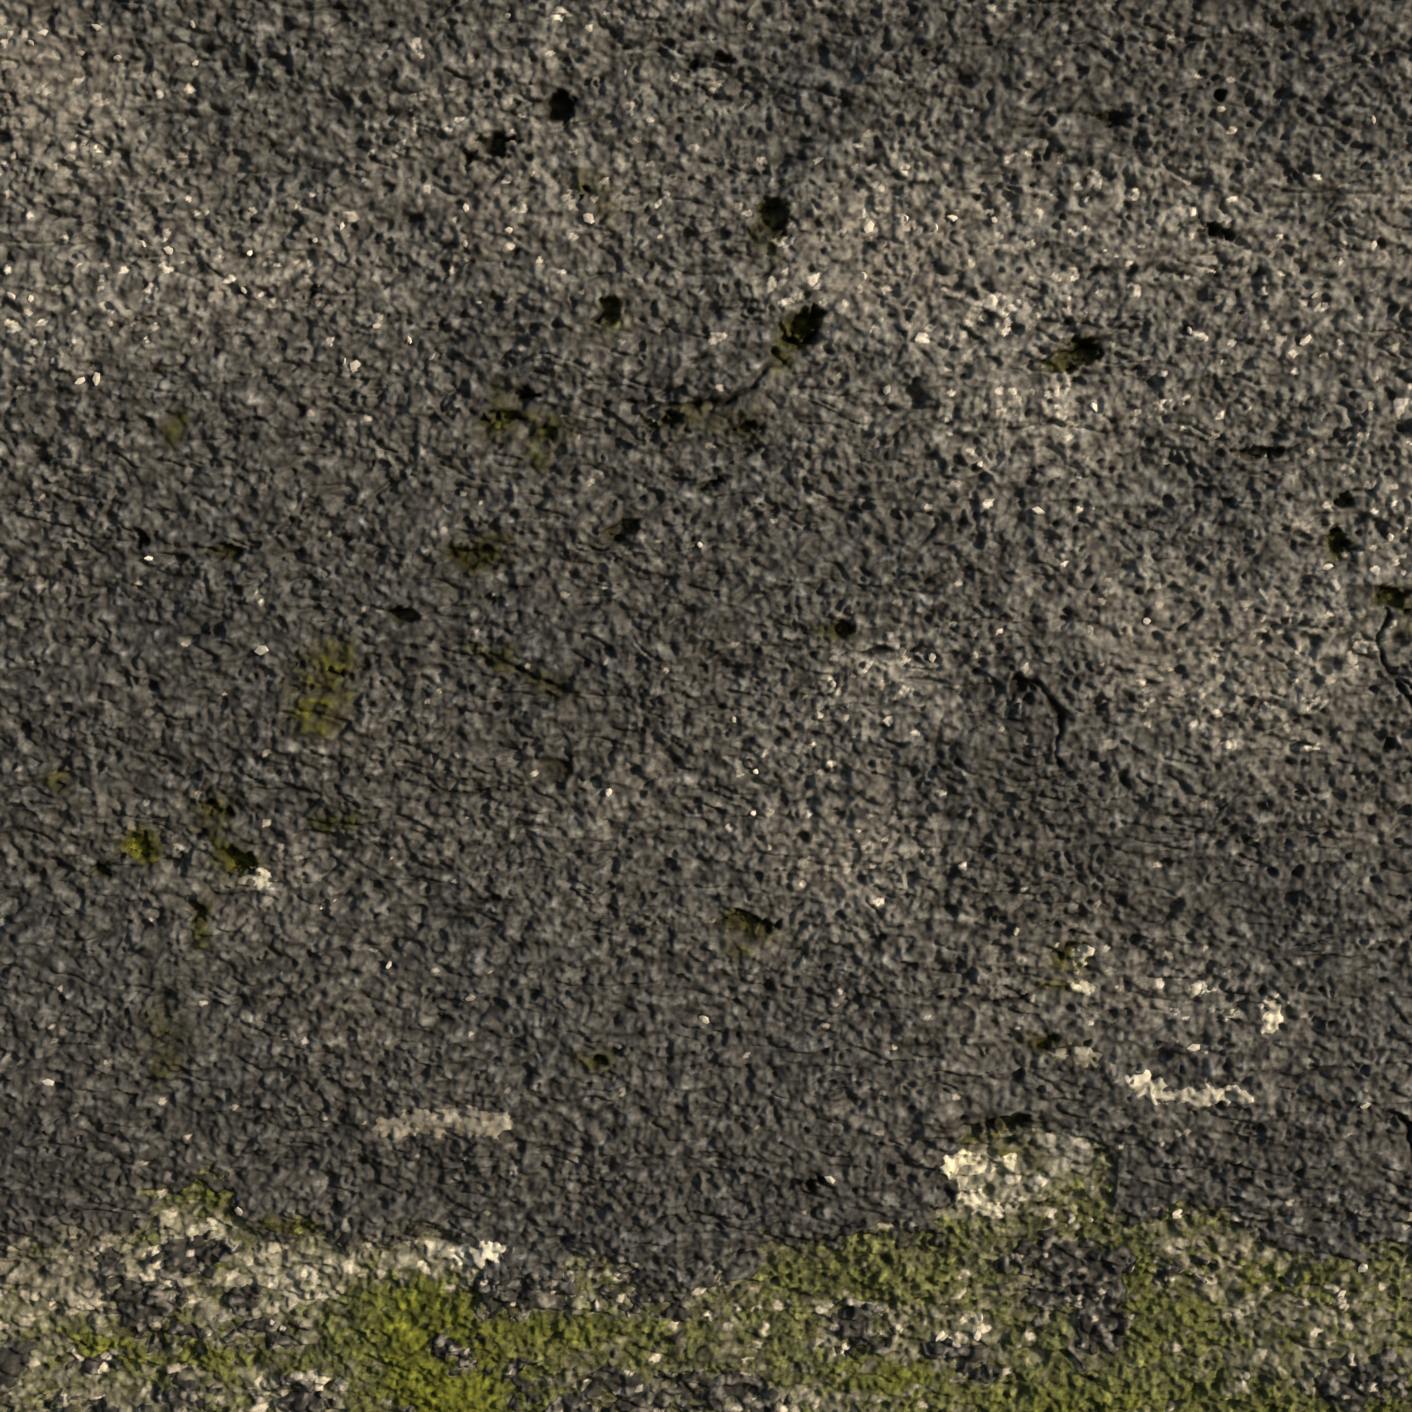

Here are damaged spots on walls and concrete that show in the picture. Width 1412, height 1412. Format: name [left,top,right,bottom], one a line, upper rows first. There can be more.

peeling [361,1104,513,1140]
water stain [6,1270,23,1284]
spalling [0,1112,1412,1412]